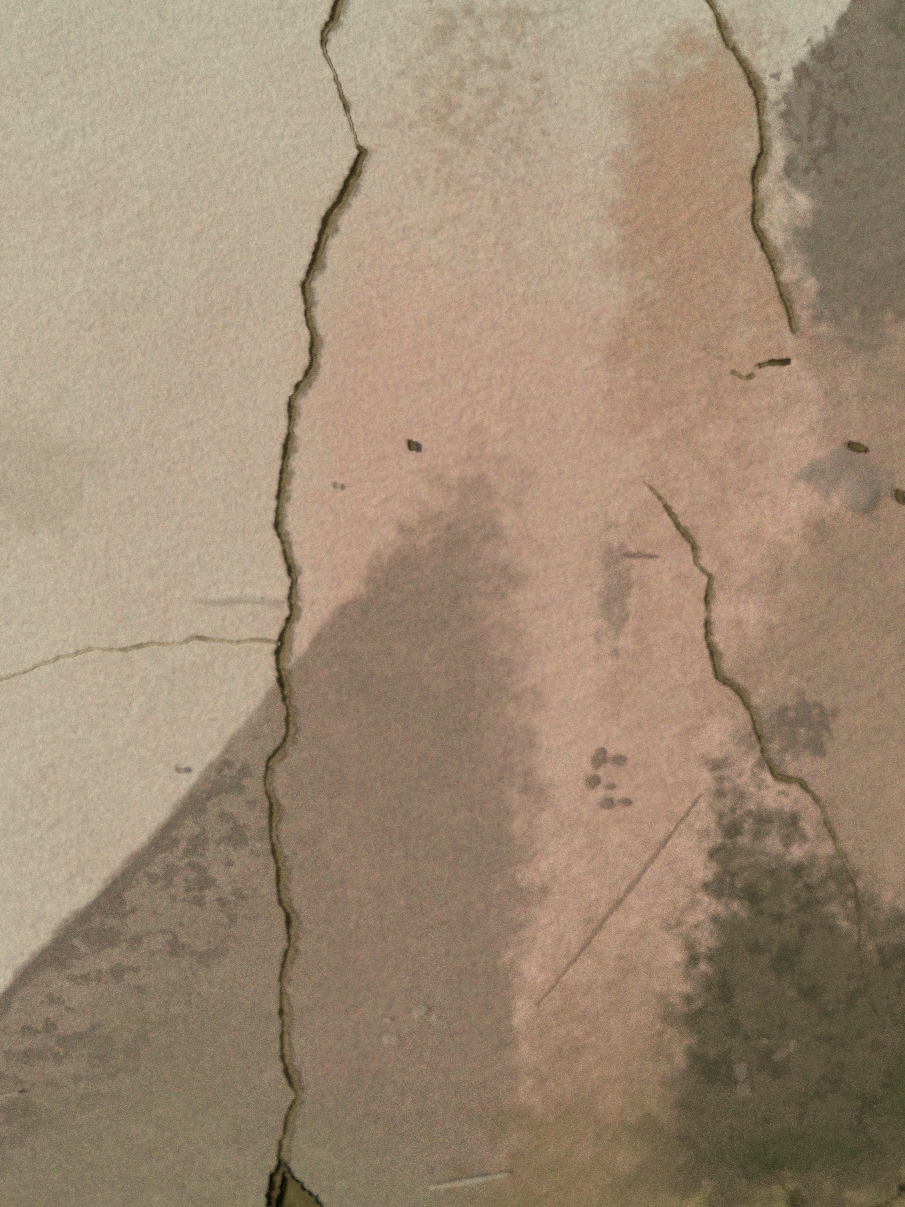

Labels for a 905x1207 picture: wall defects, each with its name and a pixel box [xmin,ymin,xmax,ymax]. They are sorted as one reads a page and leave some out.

crack [706,0,798,380]
water stain [780,0,905,326]
crack [0,0,367,1207]
water stain [0,533,524,1207]
crack [646,483,886,1030]
spalling [265,1157,320,1207]